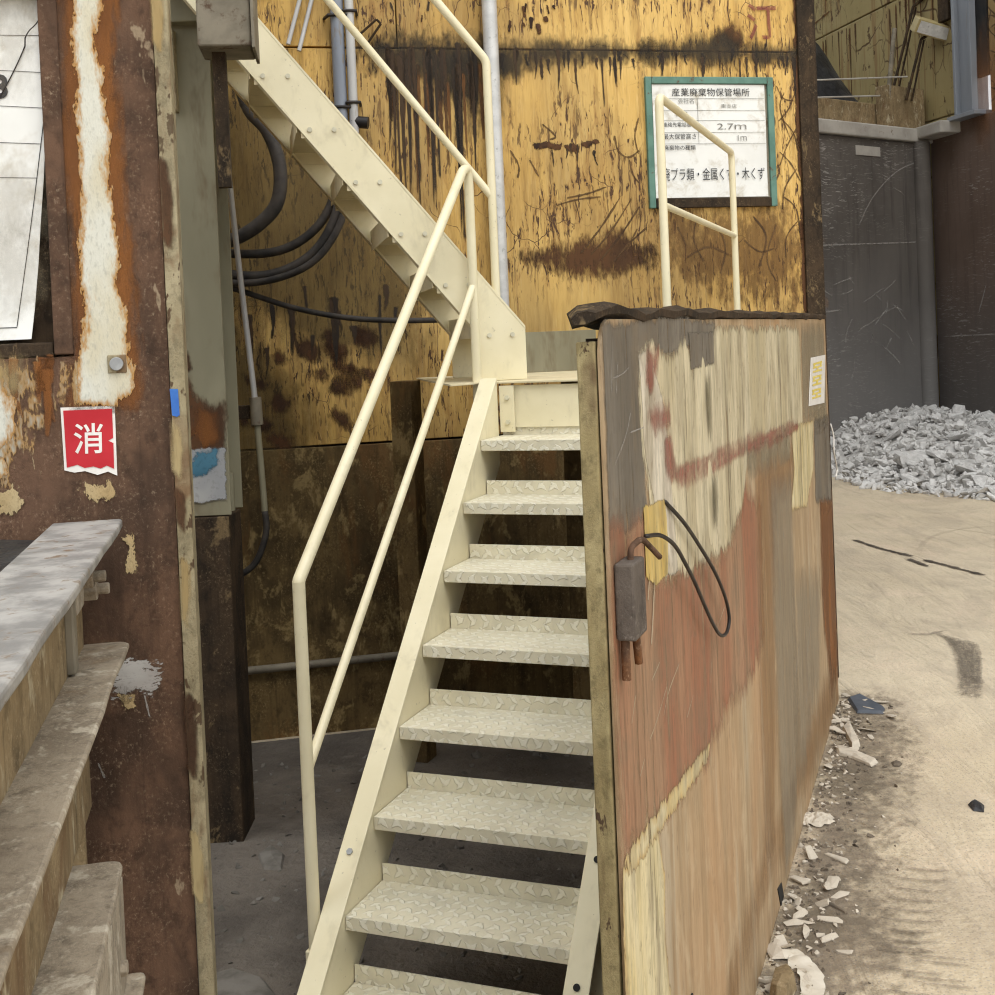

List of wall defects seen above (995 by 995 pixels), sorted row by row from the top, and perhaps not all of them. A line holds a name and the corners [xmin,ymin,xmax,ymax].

peeling [53,0,140,411]
damp [229,89,274,233]
damp [231,145,329,271]
damp [355,32,485,207]
damp [499,22,797,105]
damp [233,219,412,452]
peeling [0,356,44,516]
peeling [84,479,115,503]
peeling [122,533,138,574]
peeling [117,694,136,710]